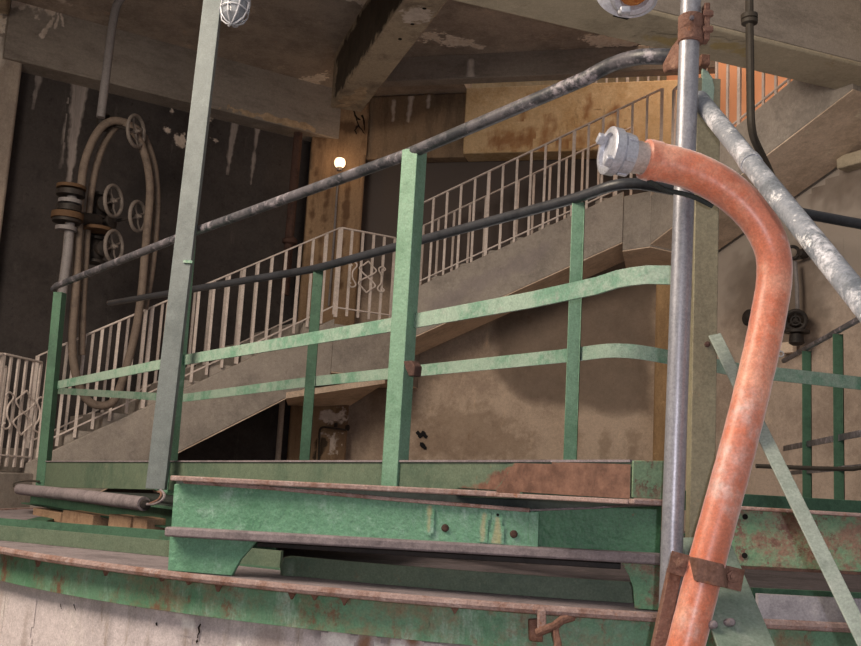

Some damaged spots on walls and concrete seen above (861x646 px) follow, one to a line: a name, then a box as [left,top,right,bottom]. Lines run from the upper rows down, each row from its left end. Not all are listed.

damp [0,0,77,99]
peeling [416,26,490,51]
damp [29,75,44,113]
efflorescence [56,83,91,182]
efflorescence [224,122,240,177]
efflorescence [248,128,263,187]
rust [476,88,630,152]
spalling [313,405,349,459]
rust [453,462,631,499]